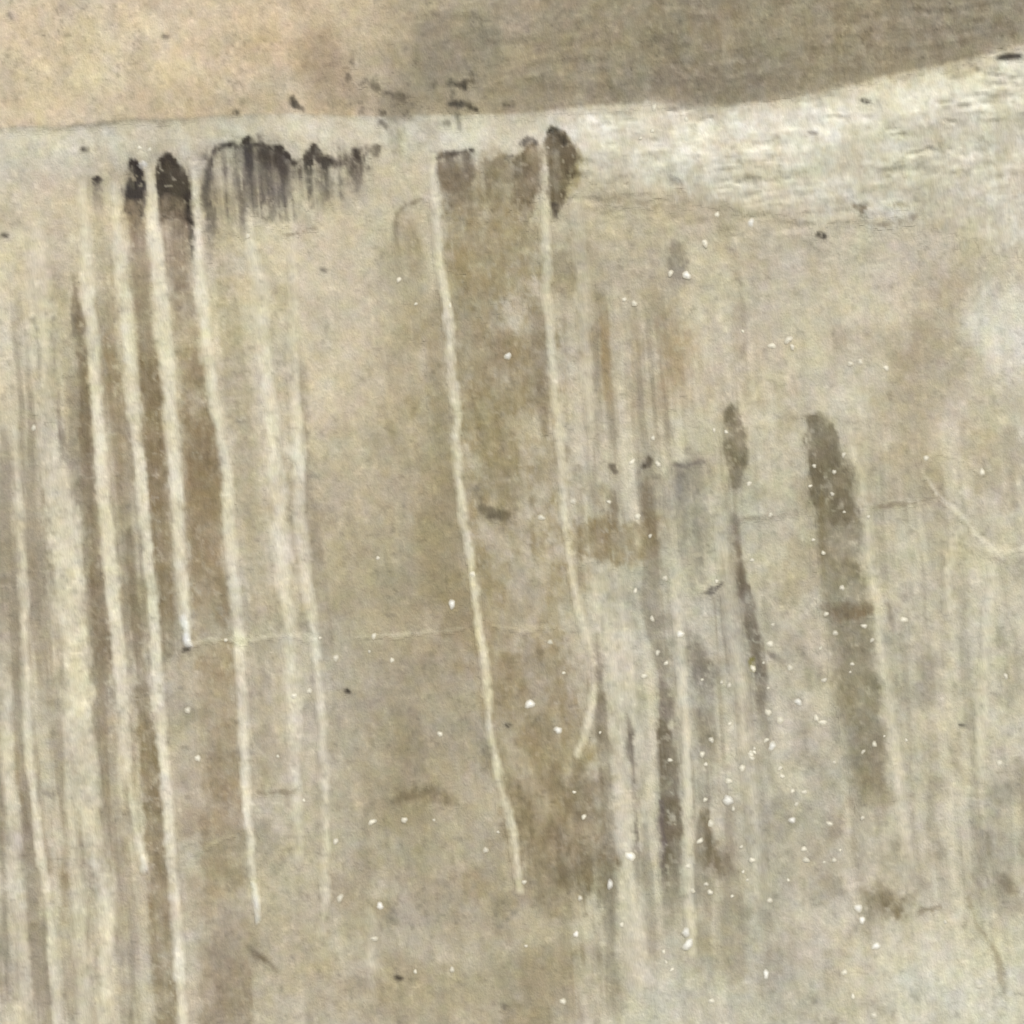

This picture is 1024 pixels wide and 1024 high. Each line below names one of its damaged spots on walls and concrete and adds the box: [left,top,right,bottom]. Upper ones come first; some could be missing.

leakage [0,126,378,1024]
leakage [383,122,791,999]
leakage [800,407,921,982]